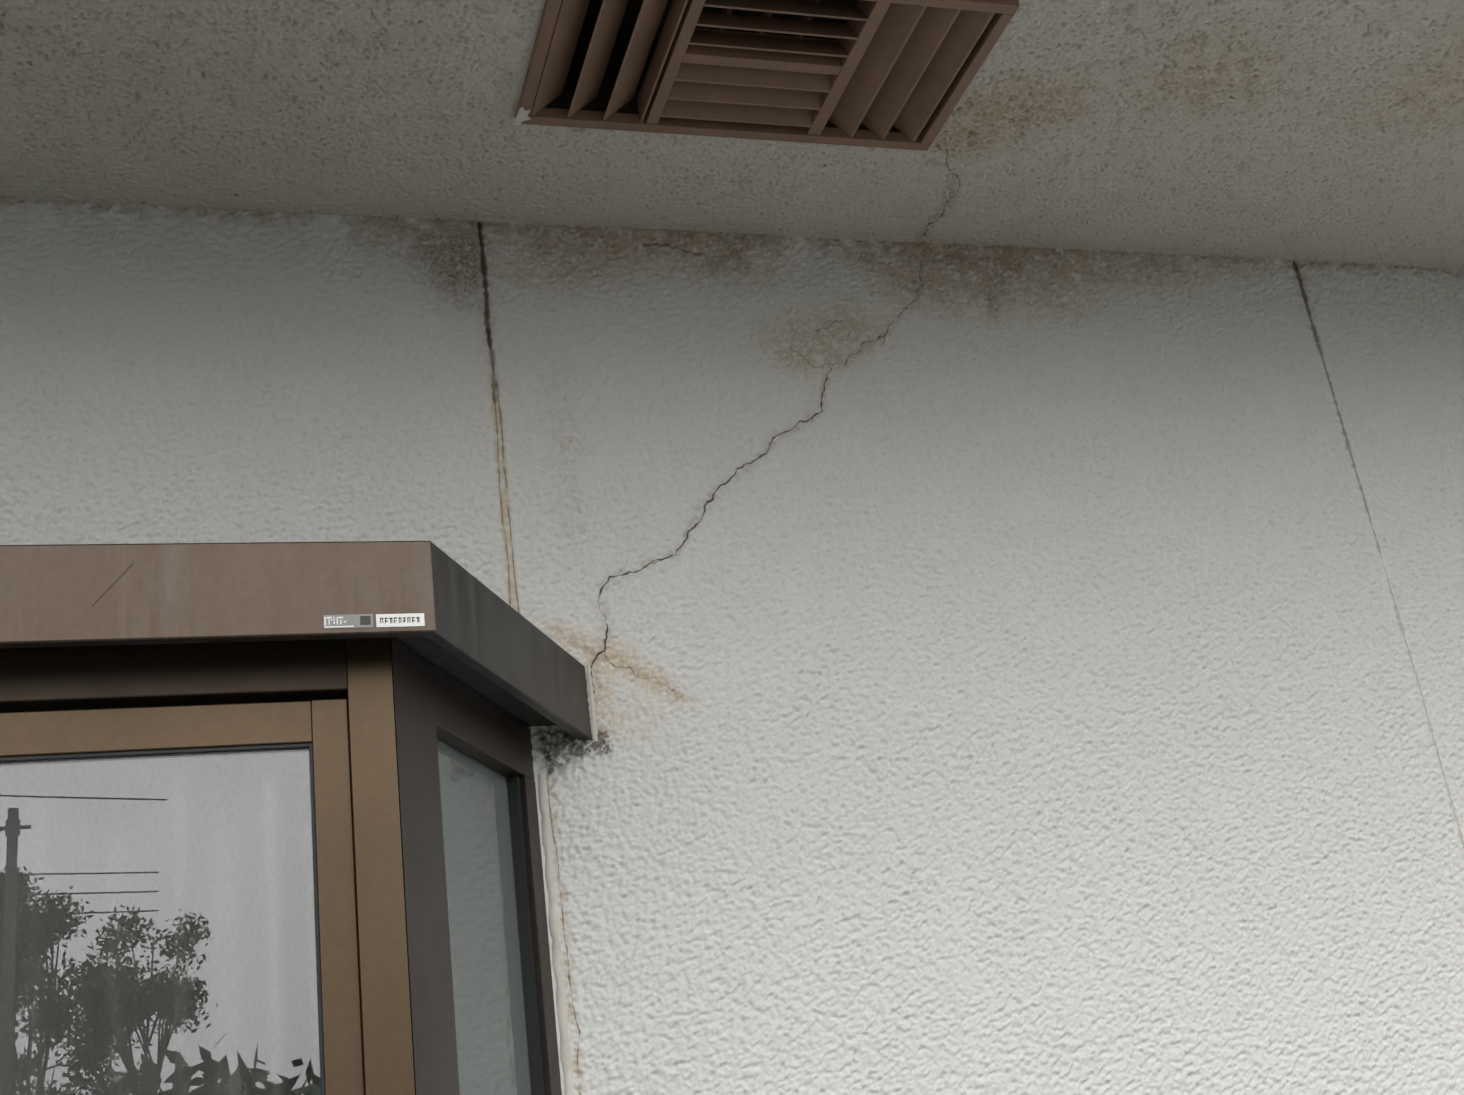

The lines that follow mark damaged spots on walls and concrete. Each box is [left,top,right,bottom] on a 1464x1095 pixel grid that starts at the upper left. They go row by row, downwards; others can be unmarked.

crack [591,324,890,693]
damp [542,731,609,772]